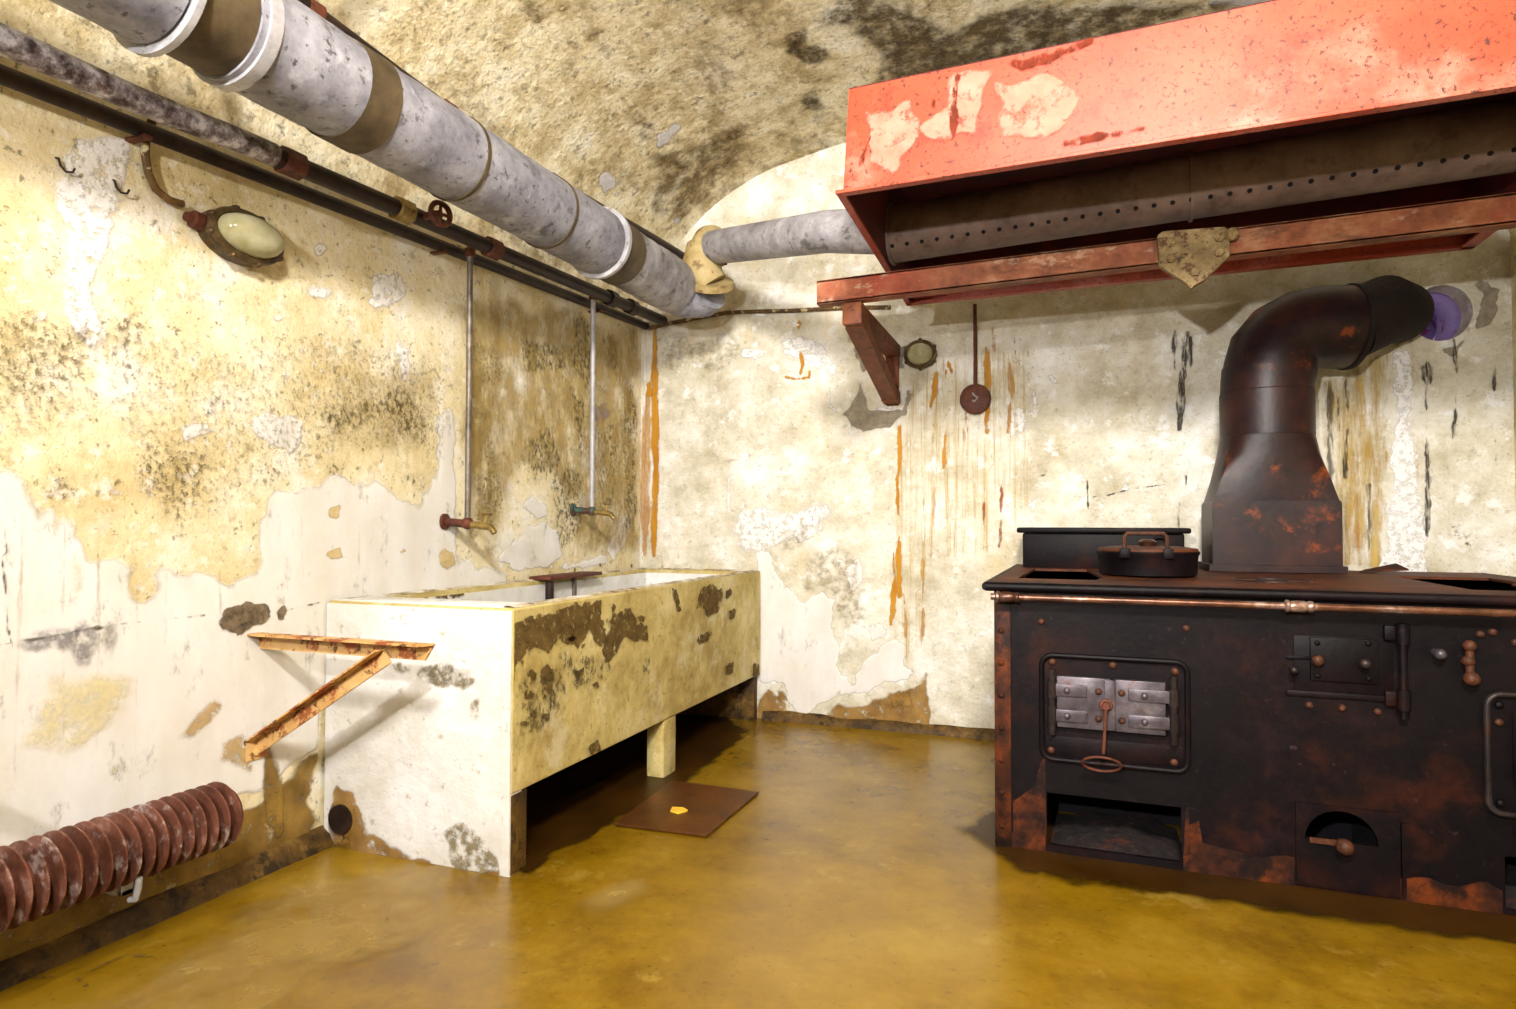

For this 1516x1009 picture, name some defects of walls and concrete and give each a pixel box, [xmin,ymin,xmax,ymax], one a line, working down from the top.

peeling [0,22,282,166]
peeling [56,137,131,345]
peeling [308,287,330,298]
peeling [369,272,406,308]
water stain [0,311,90,409]
water stain [139,449,206,526]
water stain [325,388,427,441]
water stain [465,302,637,547]
corrosion [640,329,659,557]
corrosion [965,329,1014,434]
corrosion [982,486,1003,547]
corrosion [889,537,925,637]